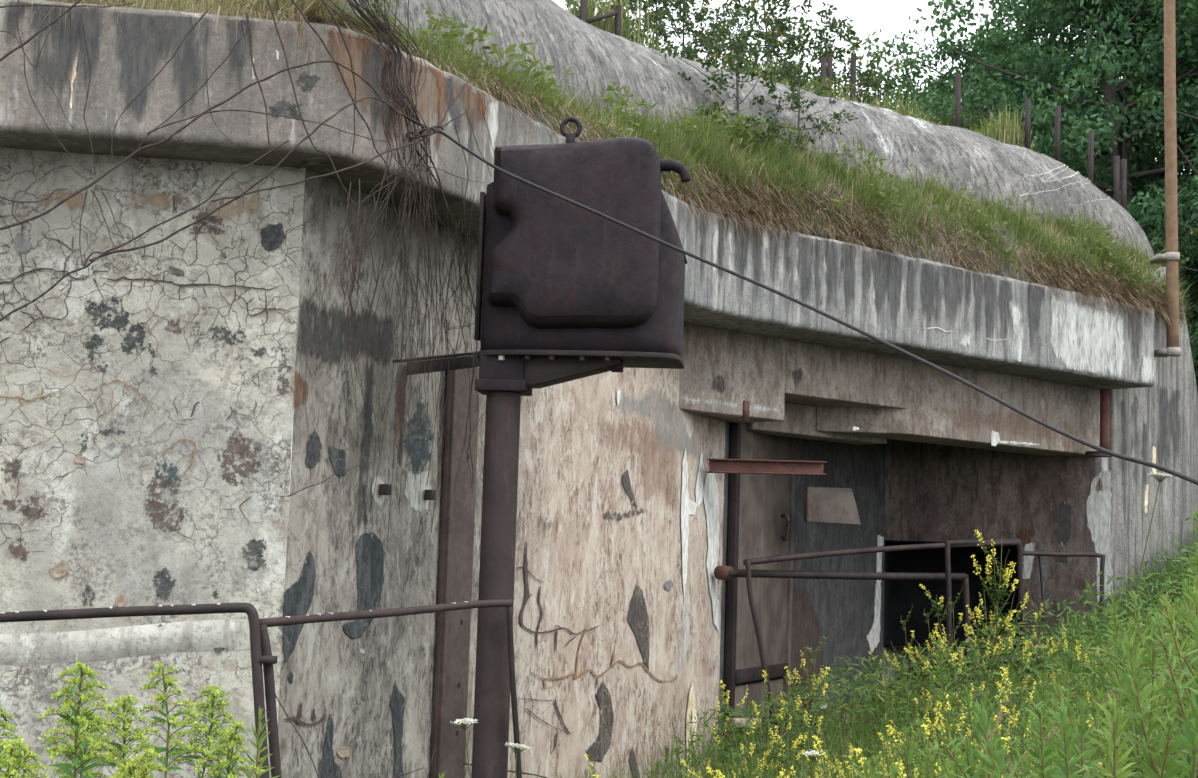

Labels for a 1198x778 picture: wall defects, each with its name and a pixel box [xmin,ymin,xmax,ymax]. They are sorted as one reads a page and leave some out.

leakage [8,1,99,93]
leakage [114,12,208,120]
leakage [229,19,254,81]
corrosion [330,28,486,150]
crack [0,196,291,523]
leakage [700,212,1179,602]
crack [0,473,67,552]